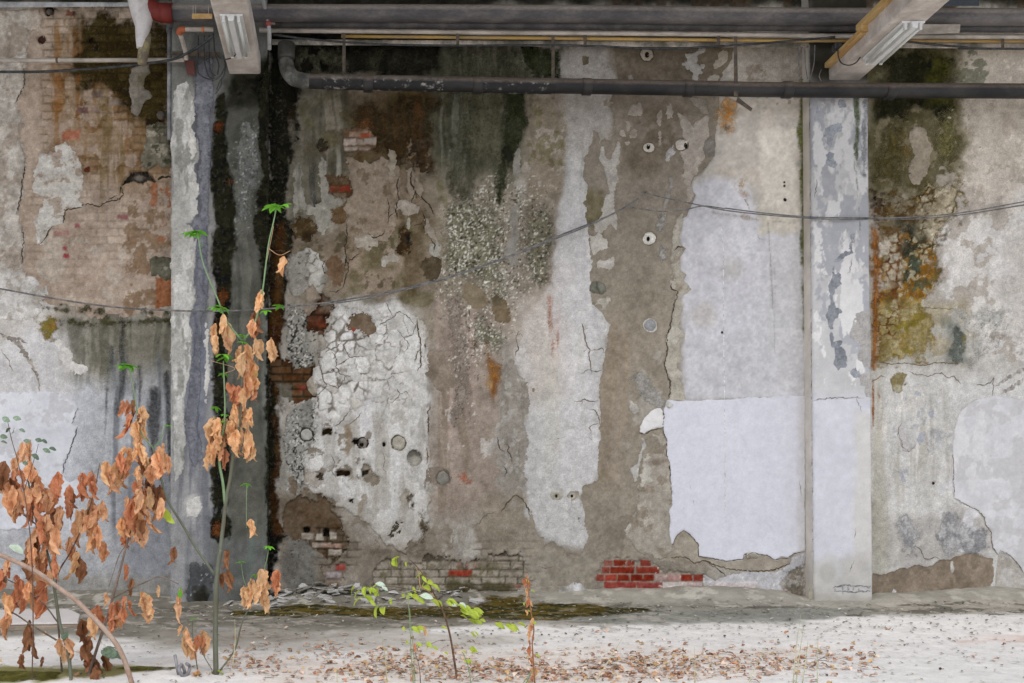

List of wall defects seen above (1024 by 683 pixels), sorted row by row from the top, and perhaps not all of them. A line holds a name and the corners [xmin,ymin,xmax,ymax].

damp [282,33,445,76]
damp [880,48,954,83]
damp [862,98,954,176]
crack [16,167,124,262]
spalling [0,7,211,481]
damp [292,157,334,235]
flaking render [269,357,316,404]
crack [302,169,436,555]
rust [487,355,501,396]
peeling [371,95,806,592]
crack [641,283,800,575]
flaking render [282,494,350,587]